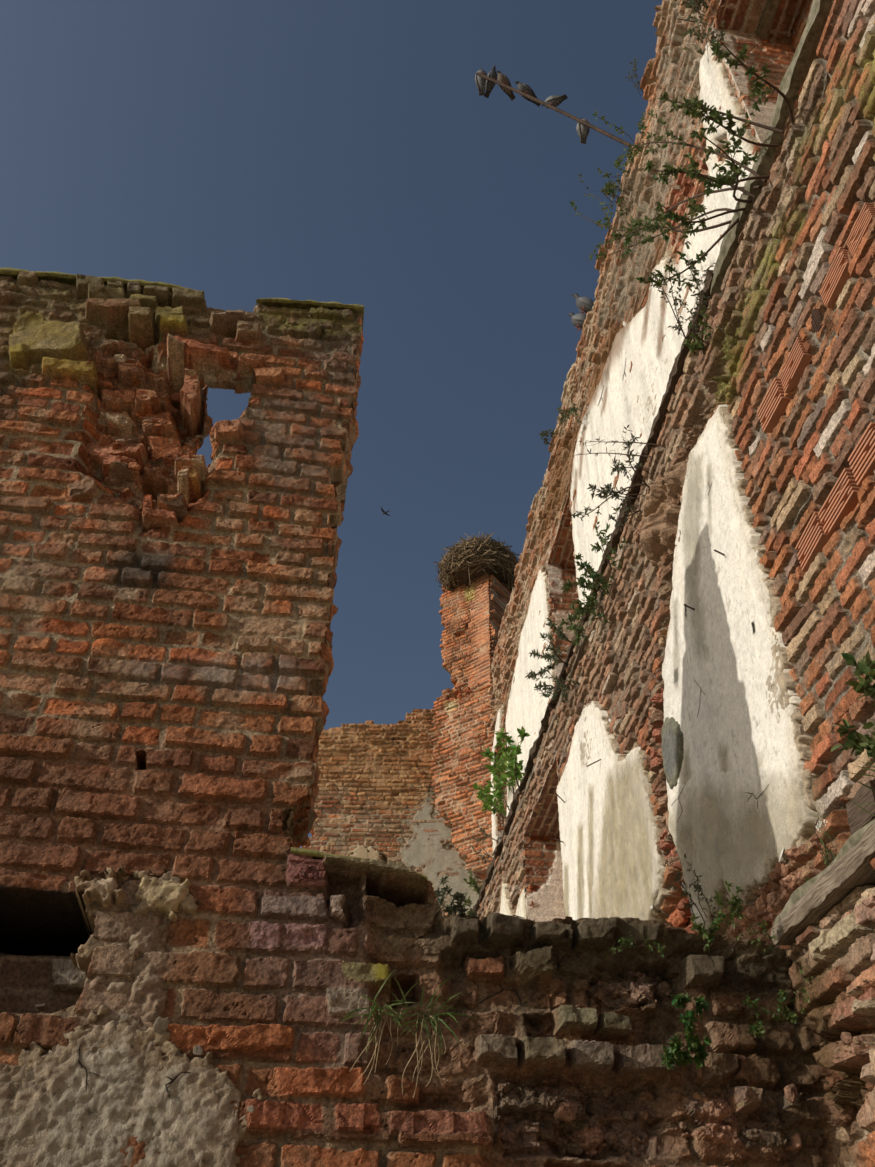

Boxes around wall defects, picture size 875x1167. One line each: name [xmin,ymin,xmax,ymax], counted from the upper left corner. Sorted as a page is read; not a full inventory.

spalling [83,333,214,512]
flaking render [347,785,483,916]
flaking render [500,877,528,919]
flaking render [0,856,265,1167]